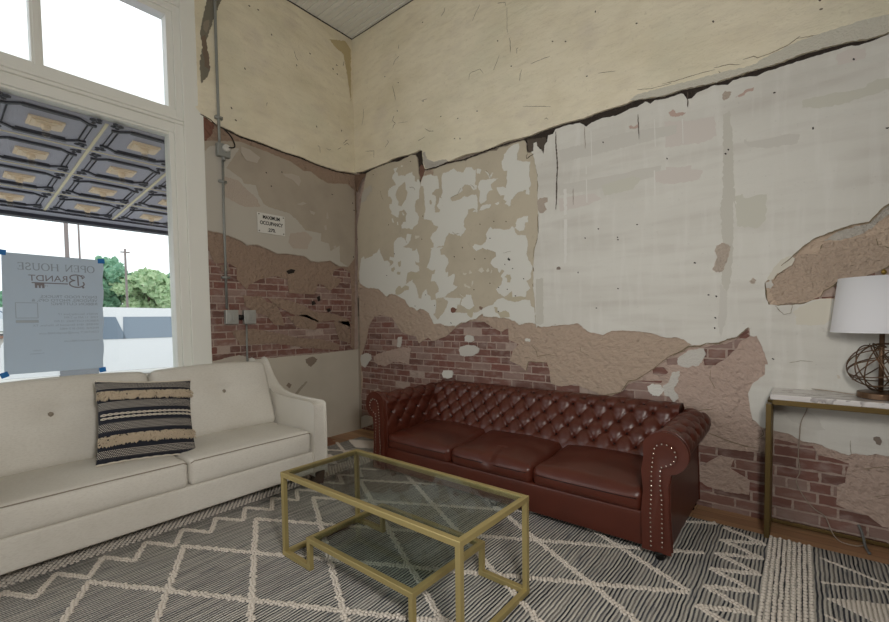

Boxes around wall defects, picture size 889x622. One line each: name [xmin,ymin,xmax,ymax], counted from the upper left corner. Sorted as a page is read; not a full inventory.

water stain [200,0,221,83]
crack [201,34,888,195]
flaking render [203,117,889,543]